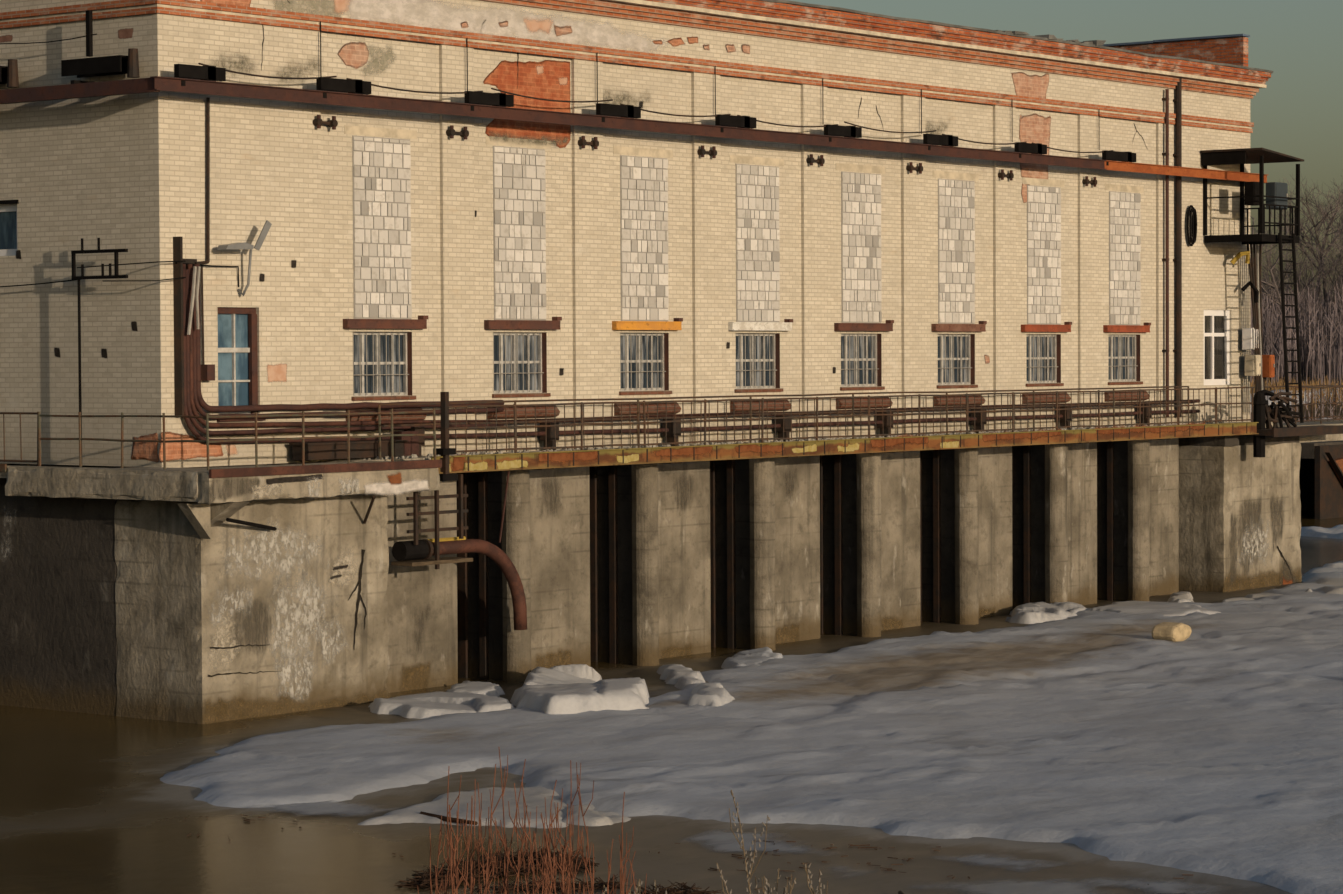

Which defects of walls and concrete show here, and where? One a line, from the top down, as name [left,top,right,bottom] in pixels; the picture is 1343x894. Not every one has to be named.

spalling [338,42,369,69]
spalling [483,60,571,148]
spalling [1011,72,1049,99]
spalling [1019,114,1051,203]
water stain [204,525,430,724]